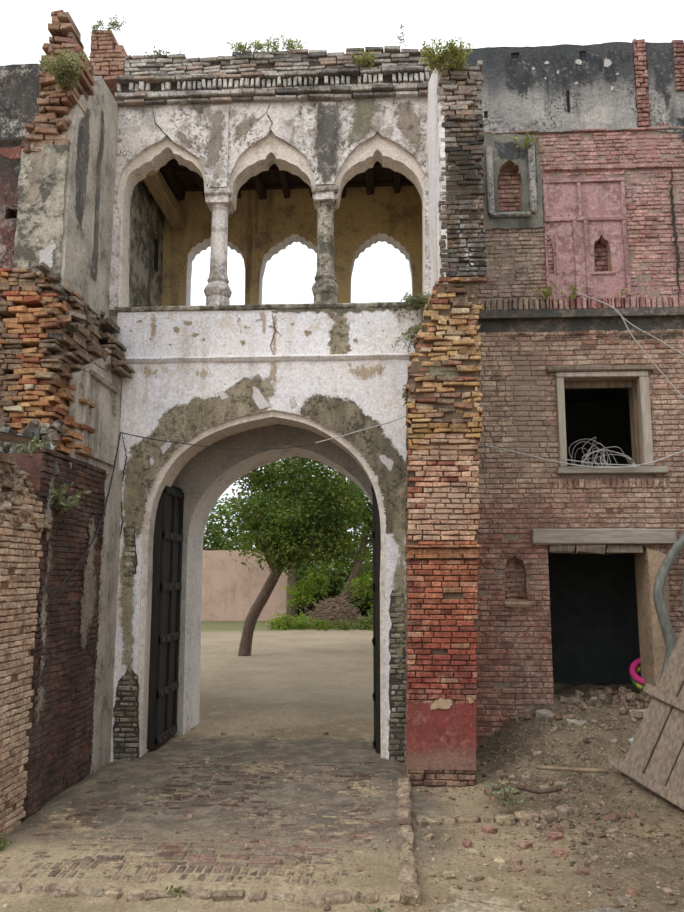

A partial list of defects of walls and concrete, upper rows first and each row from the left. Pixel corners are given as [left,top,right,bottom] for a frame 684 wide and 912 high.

water stain [0,66,44,123]
water stain [314,104,343,182]
crack [670,170,681,296]
flaking render [123,375,274,576]
flaking render [290,394,407,534]
spalling [113,666,139,761]
peeling [430,698,453,710]